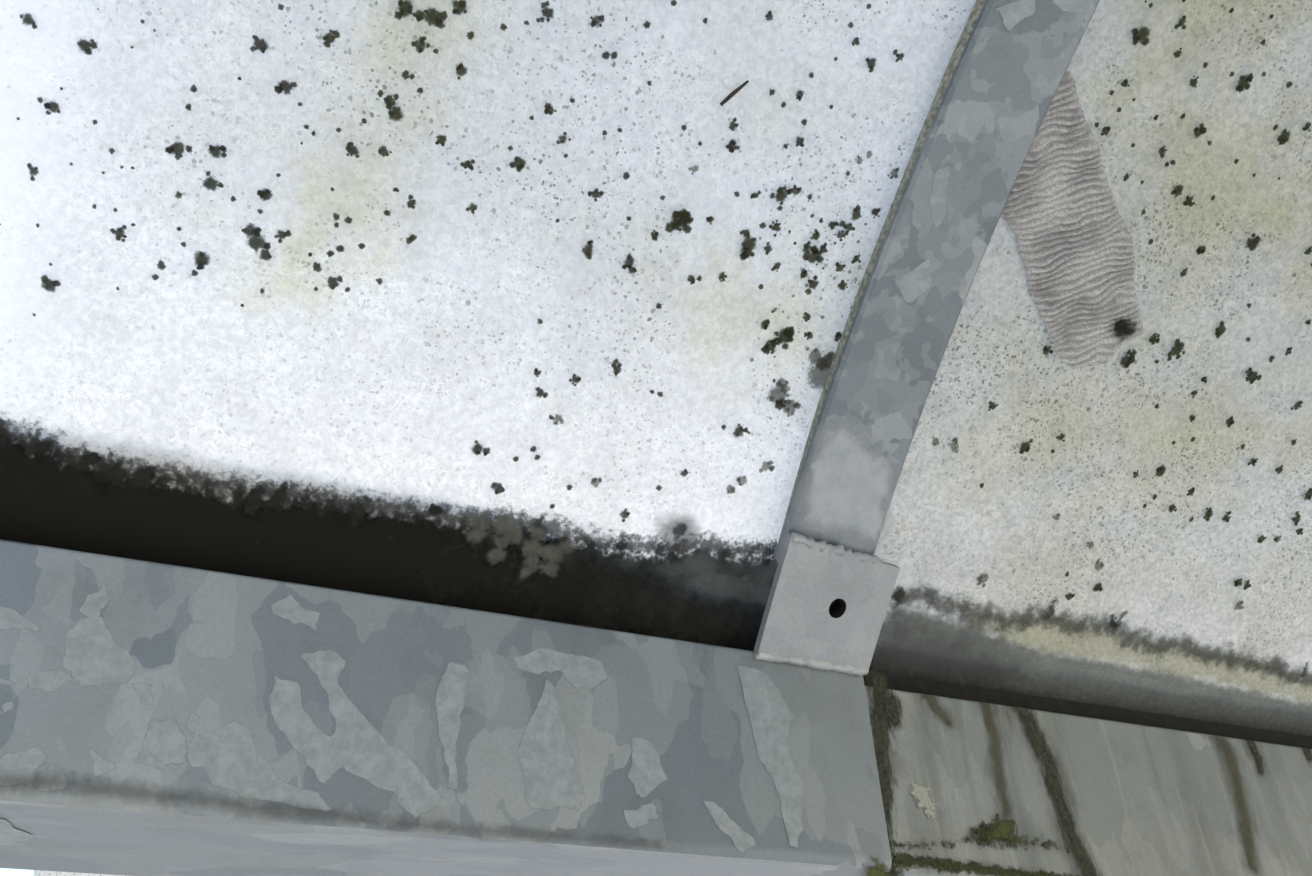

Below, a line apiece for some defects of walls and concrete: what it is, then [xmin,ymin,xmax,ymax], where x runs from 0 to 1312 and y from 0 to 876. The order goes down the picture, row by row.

damp [395,0,467,54]
damp [165,143,192,160]
damp [203,145,236,201]
damp [41,263,61,292]
damp [177,227,209,276]
damp [242,173,291,260]
damp [308,243,365,292]
damp [651,196,714,241]
damp [734,185,880,297]
damp [750,308,842,387]
damp [768,378,801,419]
damp [869,587,1312,876]